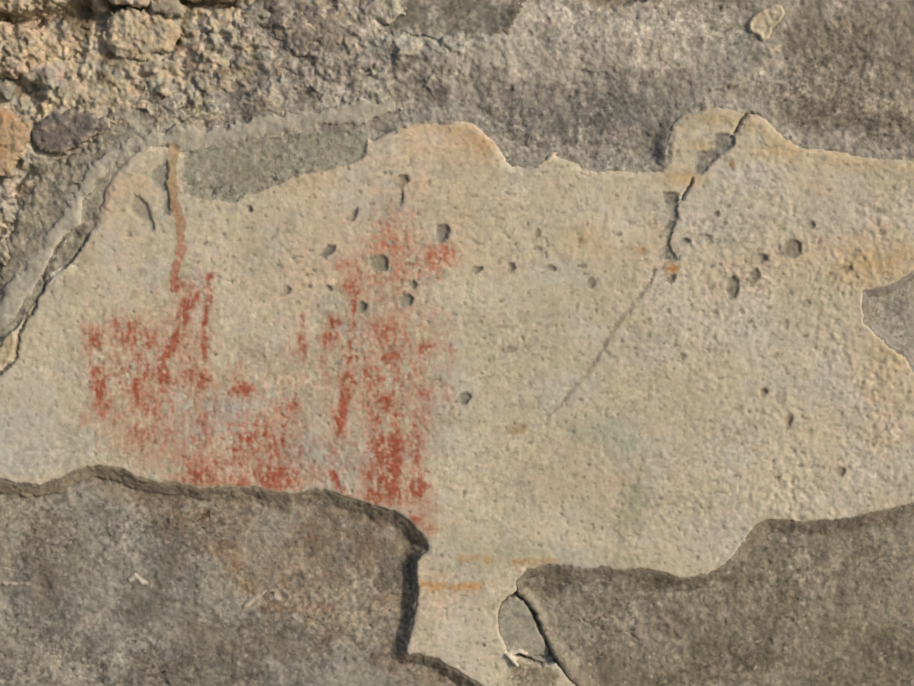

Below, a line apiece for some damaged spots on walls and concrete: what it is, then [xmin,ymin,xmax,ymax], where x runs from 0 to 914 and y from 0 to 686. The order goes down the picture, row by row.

spalling [126,158,171,231]
rust [166,142,187,293]
spalling [180,129,371,213]
spalling [576,264,597,290]
peeling [57,174,483,541]
crack [546,269,657,420]
rust [196,535,345,648]
rust [340,511,406,571]